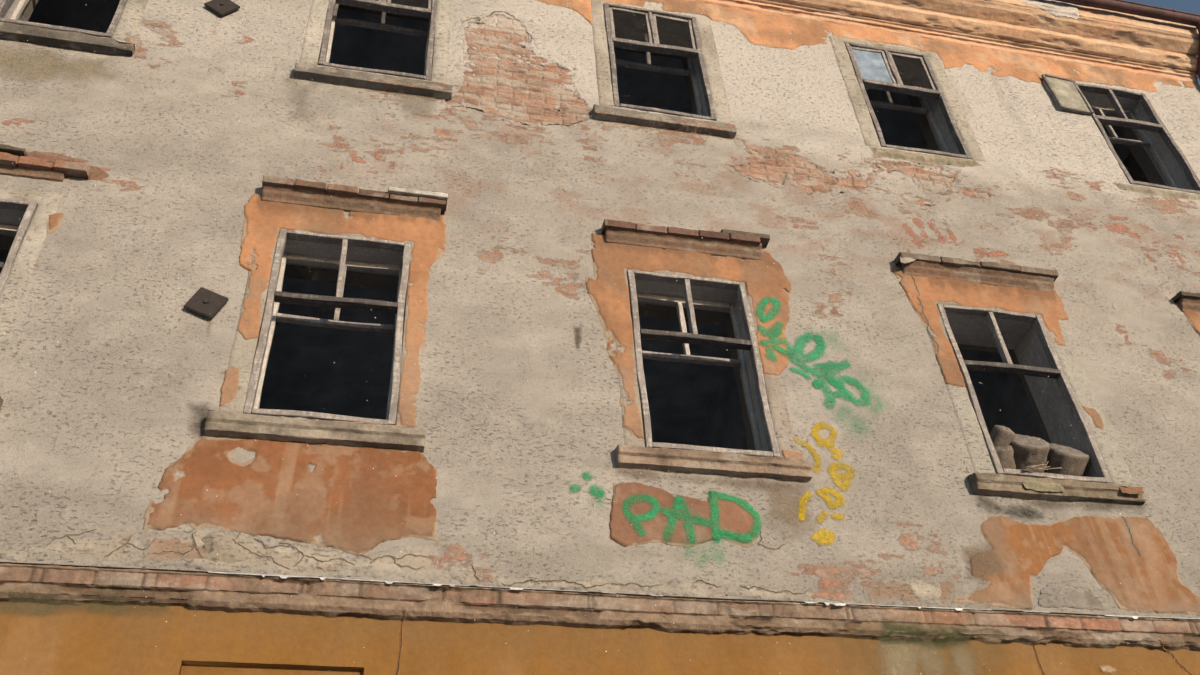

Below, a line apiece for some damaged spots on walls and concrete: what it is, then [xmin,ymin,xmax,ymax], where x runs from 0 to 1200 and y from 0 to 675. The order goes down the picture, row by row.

peeling [536,0,1195,92]
flaking render [325,10,999,252]
peeling [237,194,447,428]
peeling [474,233,792,439]
peeling [892,268,1068,387]
crack [44,528,203,558]
crack [232,532,433,570]
crack [471,565,663,590]
peeling [0,435,1200,616]
crack [693,579,812,596]
crack [757,531,788,550]
crack [1033,644,1045,675]